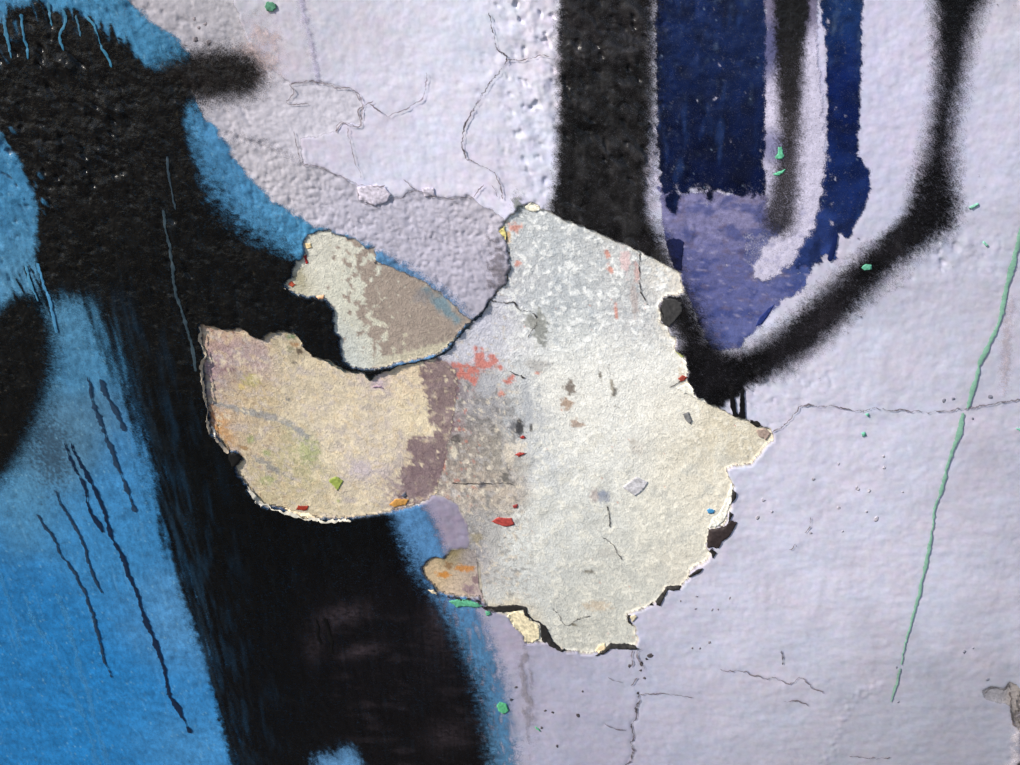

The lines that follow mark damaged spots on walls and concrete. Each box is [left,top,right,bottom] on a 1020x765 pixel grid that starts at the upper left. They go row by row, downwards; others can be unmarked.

crack [286,13,550,208]
peeling [130,0,774,656]
crack [773,399,1020,432]
crack [607,650,693,765]
crack [721,651,823,706]